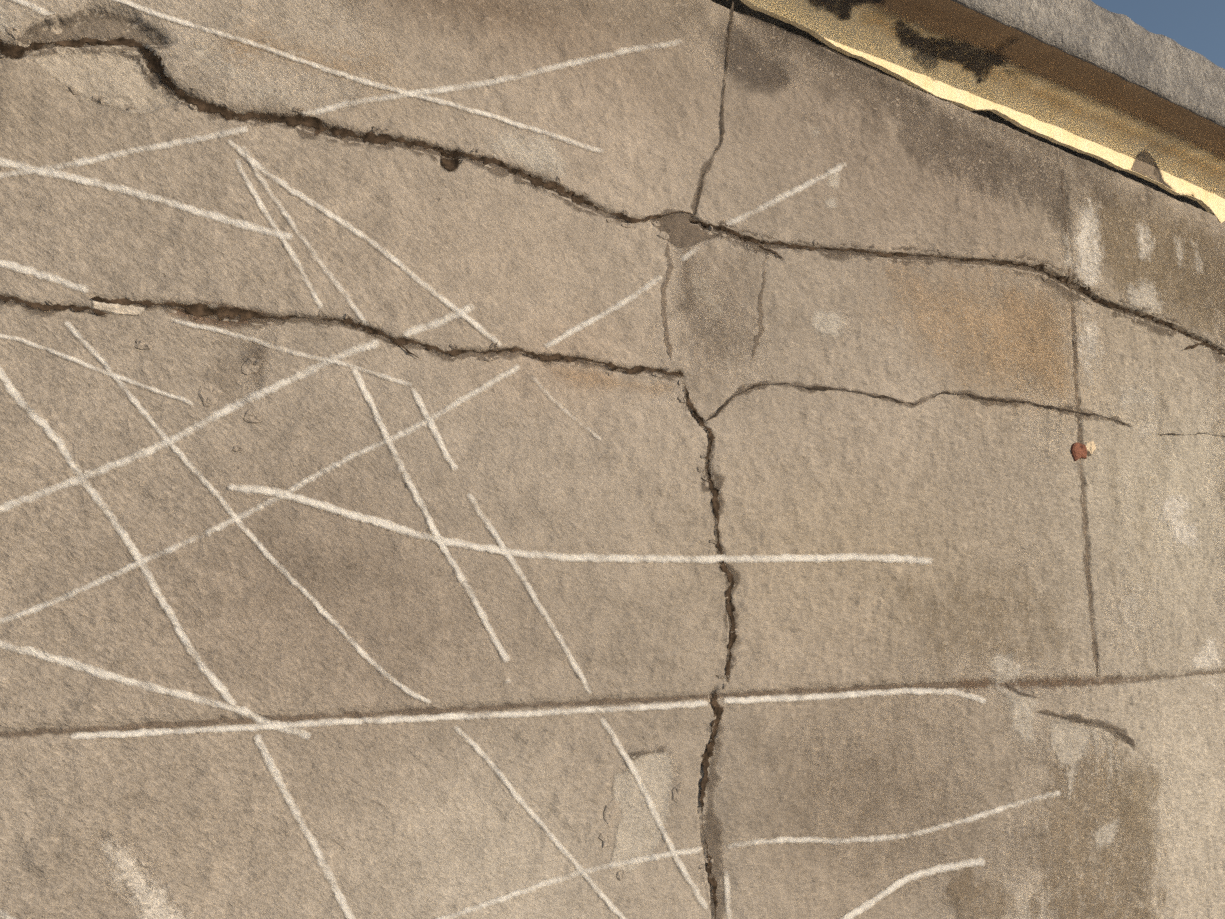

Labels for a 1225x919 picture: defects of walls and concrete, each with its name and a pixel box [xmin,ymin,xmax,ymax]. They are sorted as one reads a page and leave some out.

crack [0,2,1225,362]
crack [0,294,1225,919]
leakage [1041,757,1156,919]